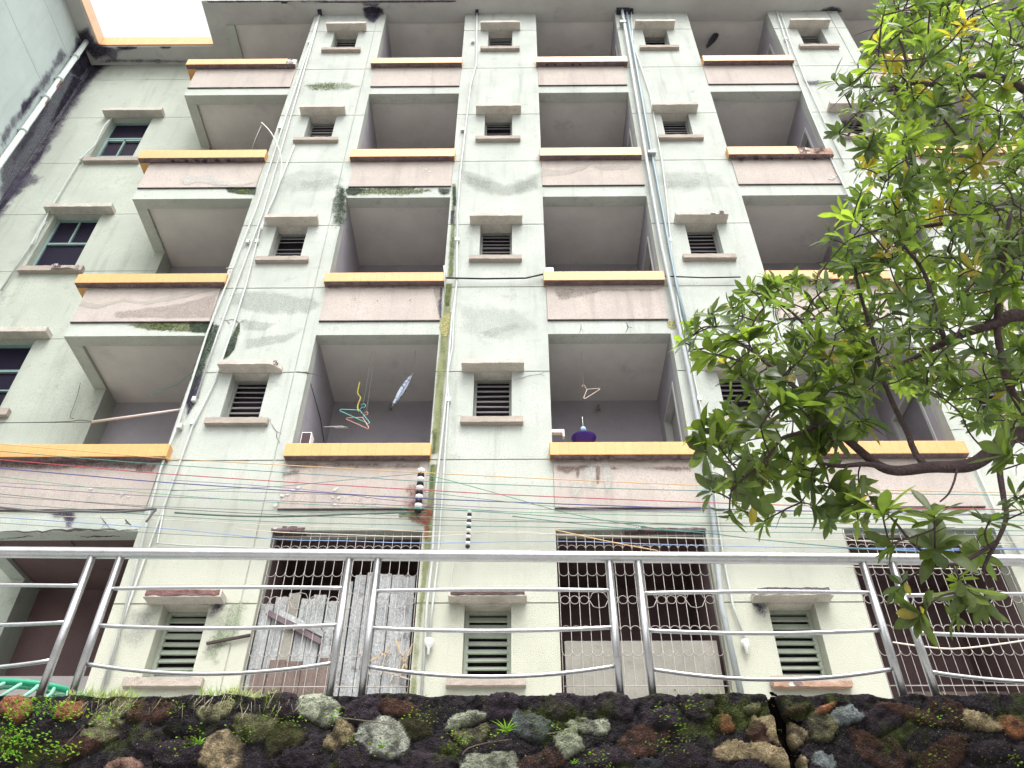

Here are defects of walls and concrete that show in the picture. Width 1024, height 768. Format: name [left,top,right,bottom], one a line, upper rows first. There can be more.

water stain [0,28,161,213]
water stain [333,186,363,226]
water stain [438,187,456,224]
water stain [435,286,450,318]
water stain [82,288,219,414]
corrosion [399,490,433,536]
crack [769,692,803,768]